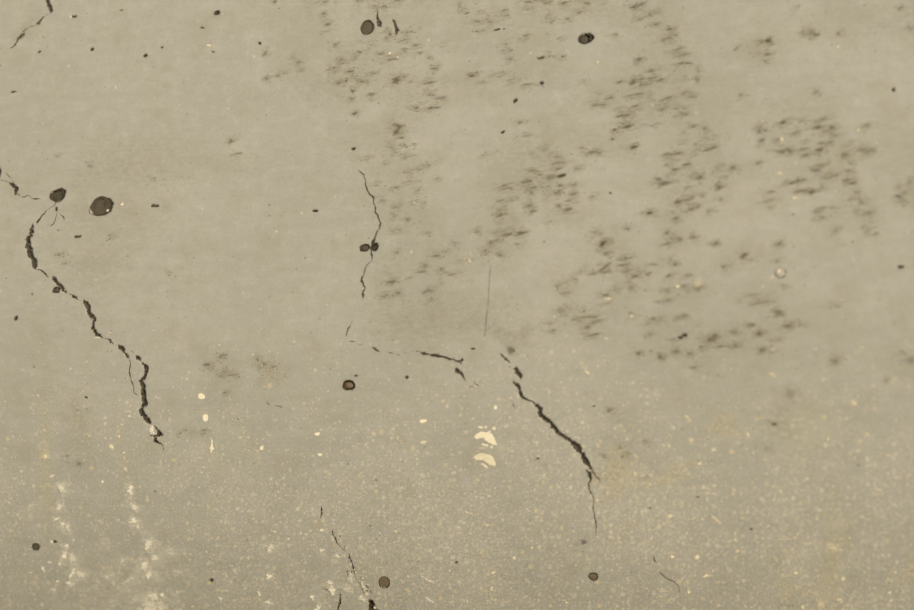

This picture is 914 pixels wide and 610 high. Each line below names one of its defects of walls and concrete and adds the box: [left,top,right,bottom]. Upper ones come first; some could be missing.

crack [10,0,53,49]
crack [358,169,382,299]
crack [0,170,164,450]
crack [346,320,478,387]
crack [501,354,600,533]
crack [320,506,373,610]